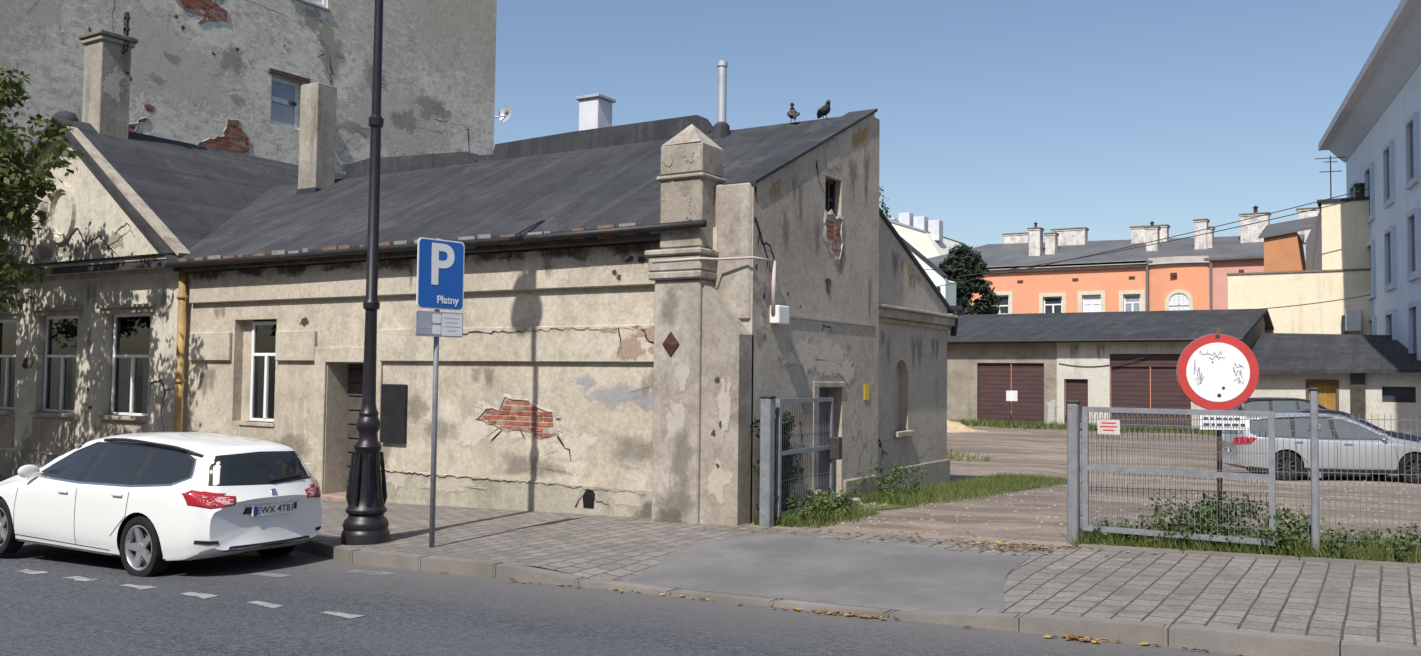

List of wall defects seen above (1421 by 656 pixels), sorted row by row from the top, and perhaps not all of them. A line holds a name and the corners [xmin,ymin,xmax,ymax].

flaking render [822,209,843,292]
flaking render [454,393,599,461]